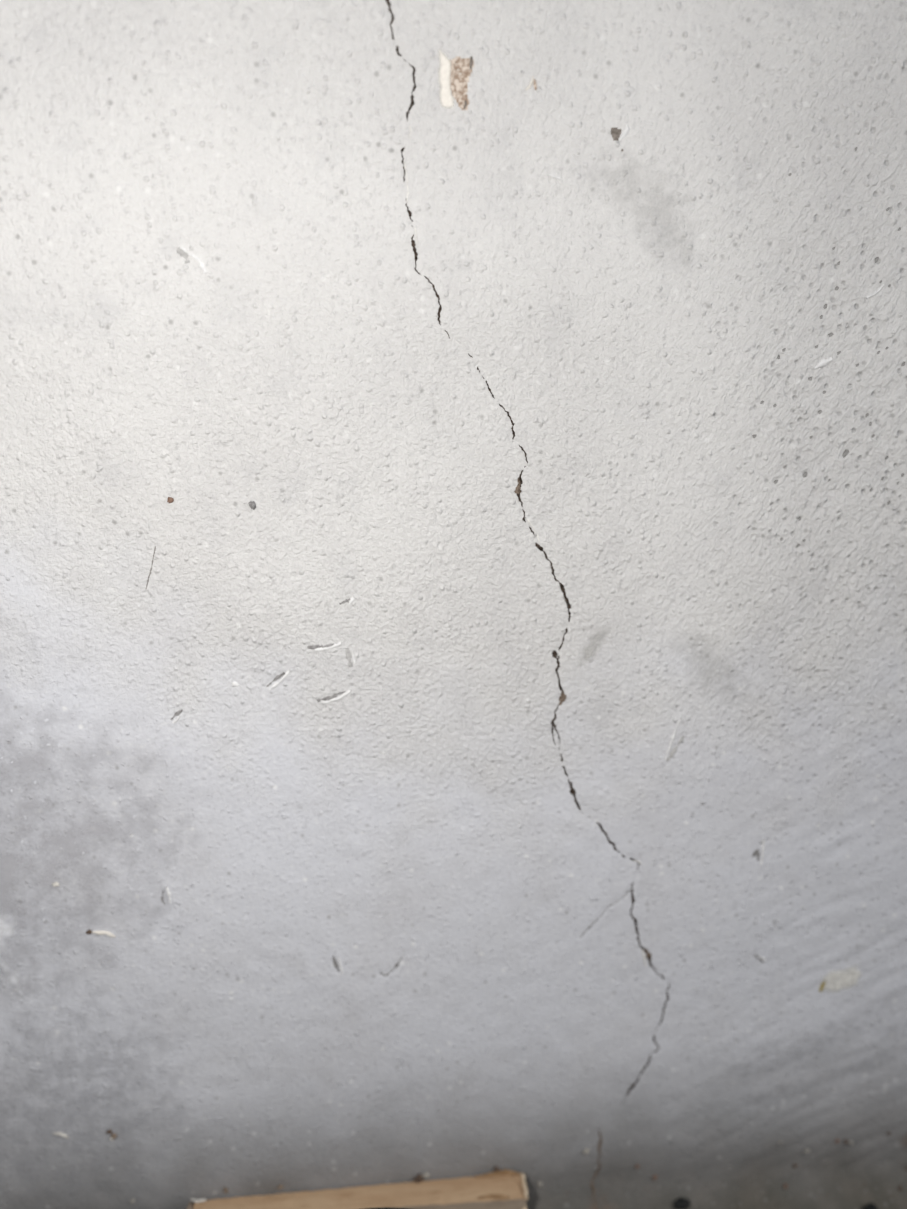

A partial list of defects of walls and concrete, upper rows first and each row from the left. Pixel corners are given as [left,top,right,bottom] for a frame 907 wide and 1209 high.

crack [385,0,670,1105]